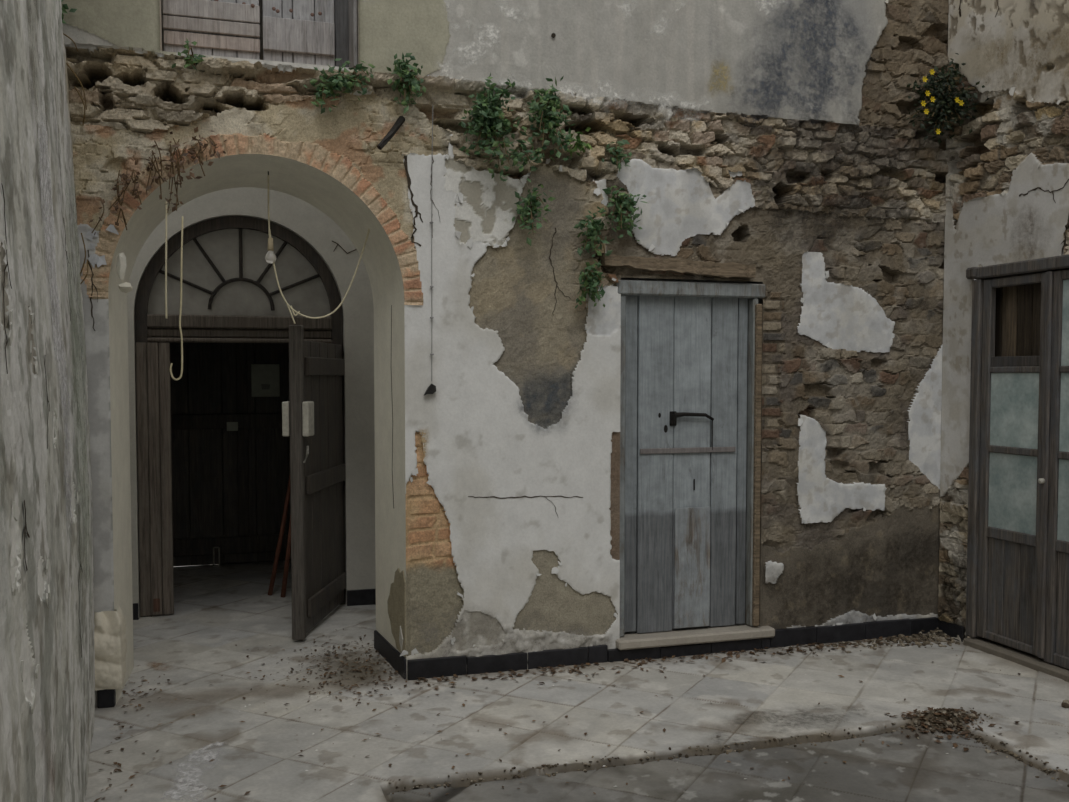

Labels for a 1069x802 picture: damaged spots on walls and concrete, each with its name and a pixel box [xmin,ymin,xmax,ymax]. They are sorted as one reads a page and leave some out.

crack [1019,179,1069,254]
flaking render [65,0,1069,656]
crack [468,496,583,516]